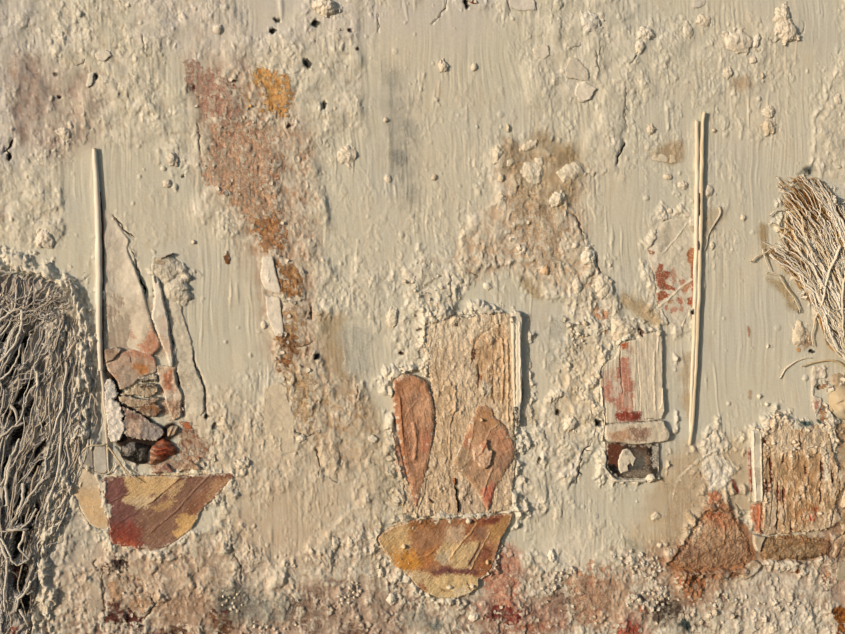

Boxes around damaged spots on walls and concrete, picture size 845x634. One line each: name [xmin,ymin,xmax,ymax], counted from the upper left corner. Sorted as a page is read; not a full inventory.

crack [617,90,628,164]
crack [114,217,164,298]